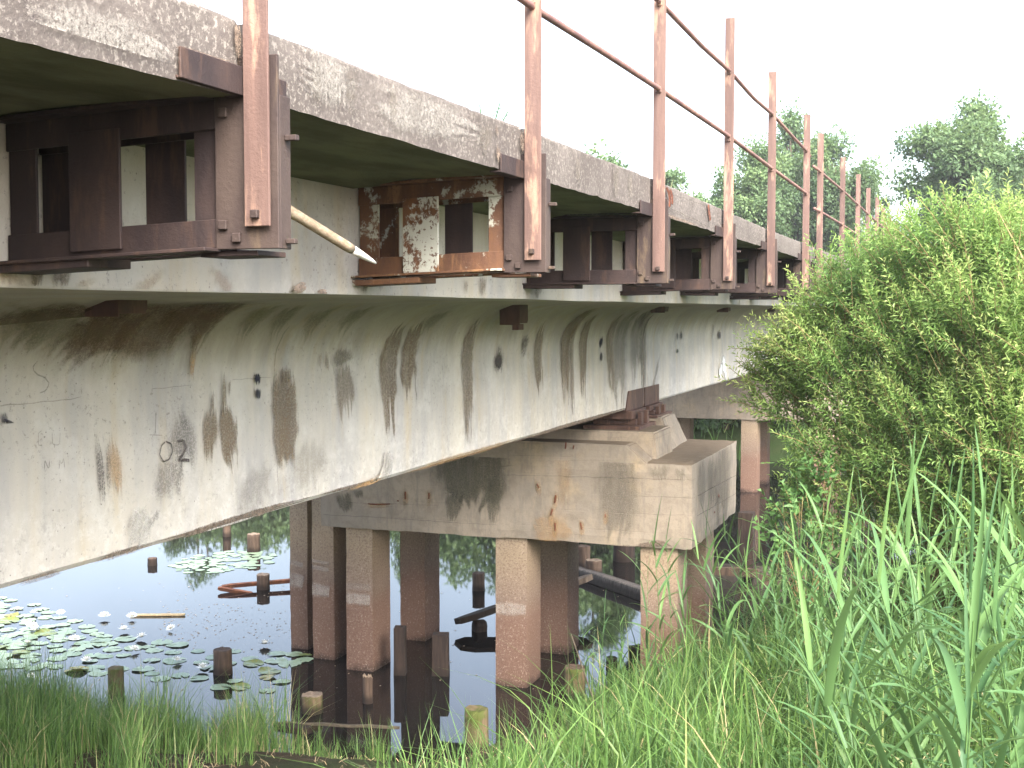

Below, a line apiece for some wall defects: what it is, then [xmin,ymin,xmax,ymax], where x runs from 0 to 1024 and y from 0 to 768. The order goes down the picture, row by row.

water stain [173,375,238,468]
water stain [273,369,299,465]
water stain [380,323,421,433]
water stain [463,321,479,439]
water stain [561,309,595,406]
water stain [607,312,653,385]
water stain [437,456,504,520]